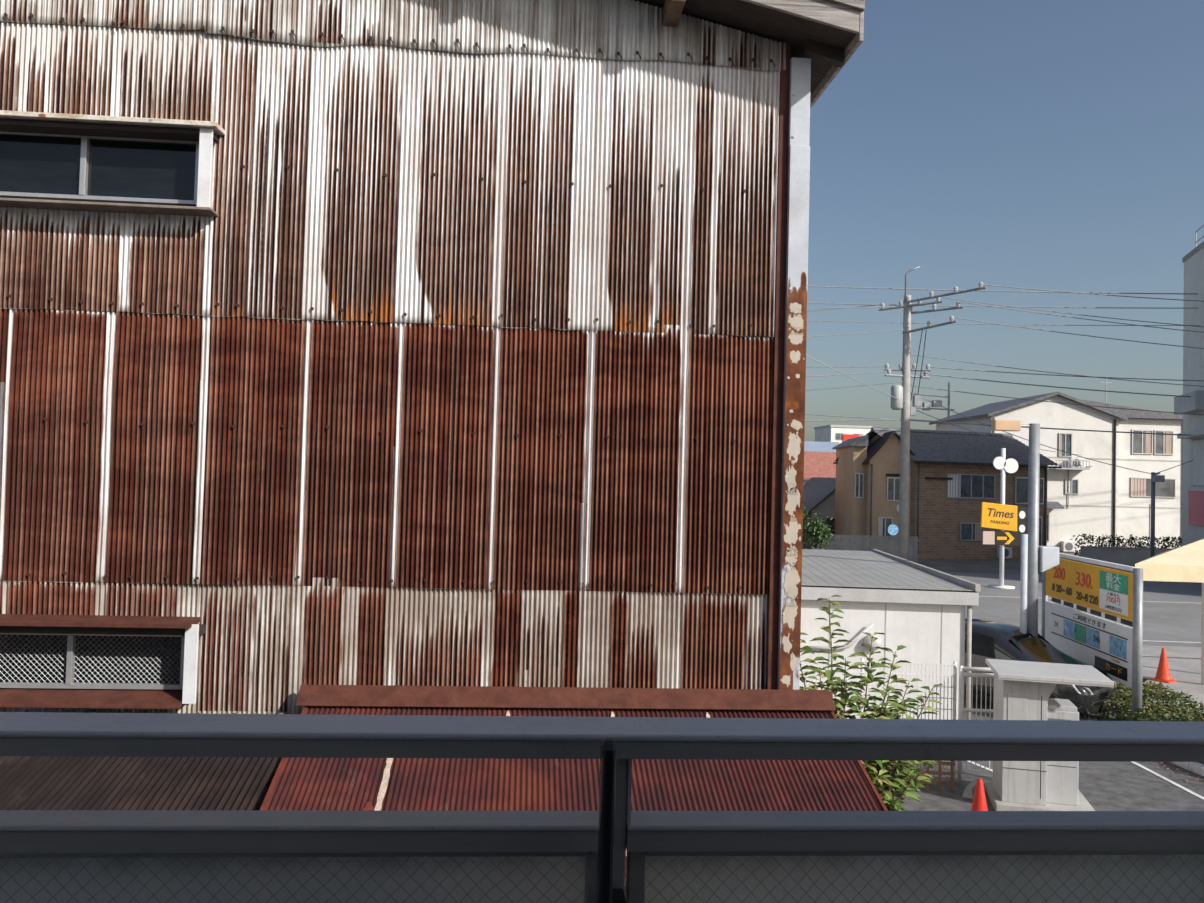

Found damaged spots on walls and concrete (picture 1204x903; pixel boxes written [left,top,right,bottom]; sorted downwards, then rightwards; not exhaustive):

corrosion [0,0,807,712]